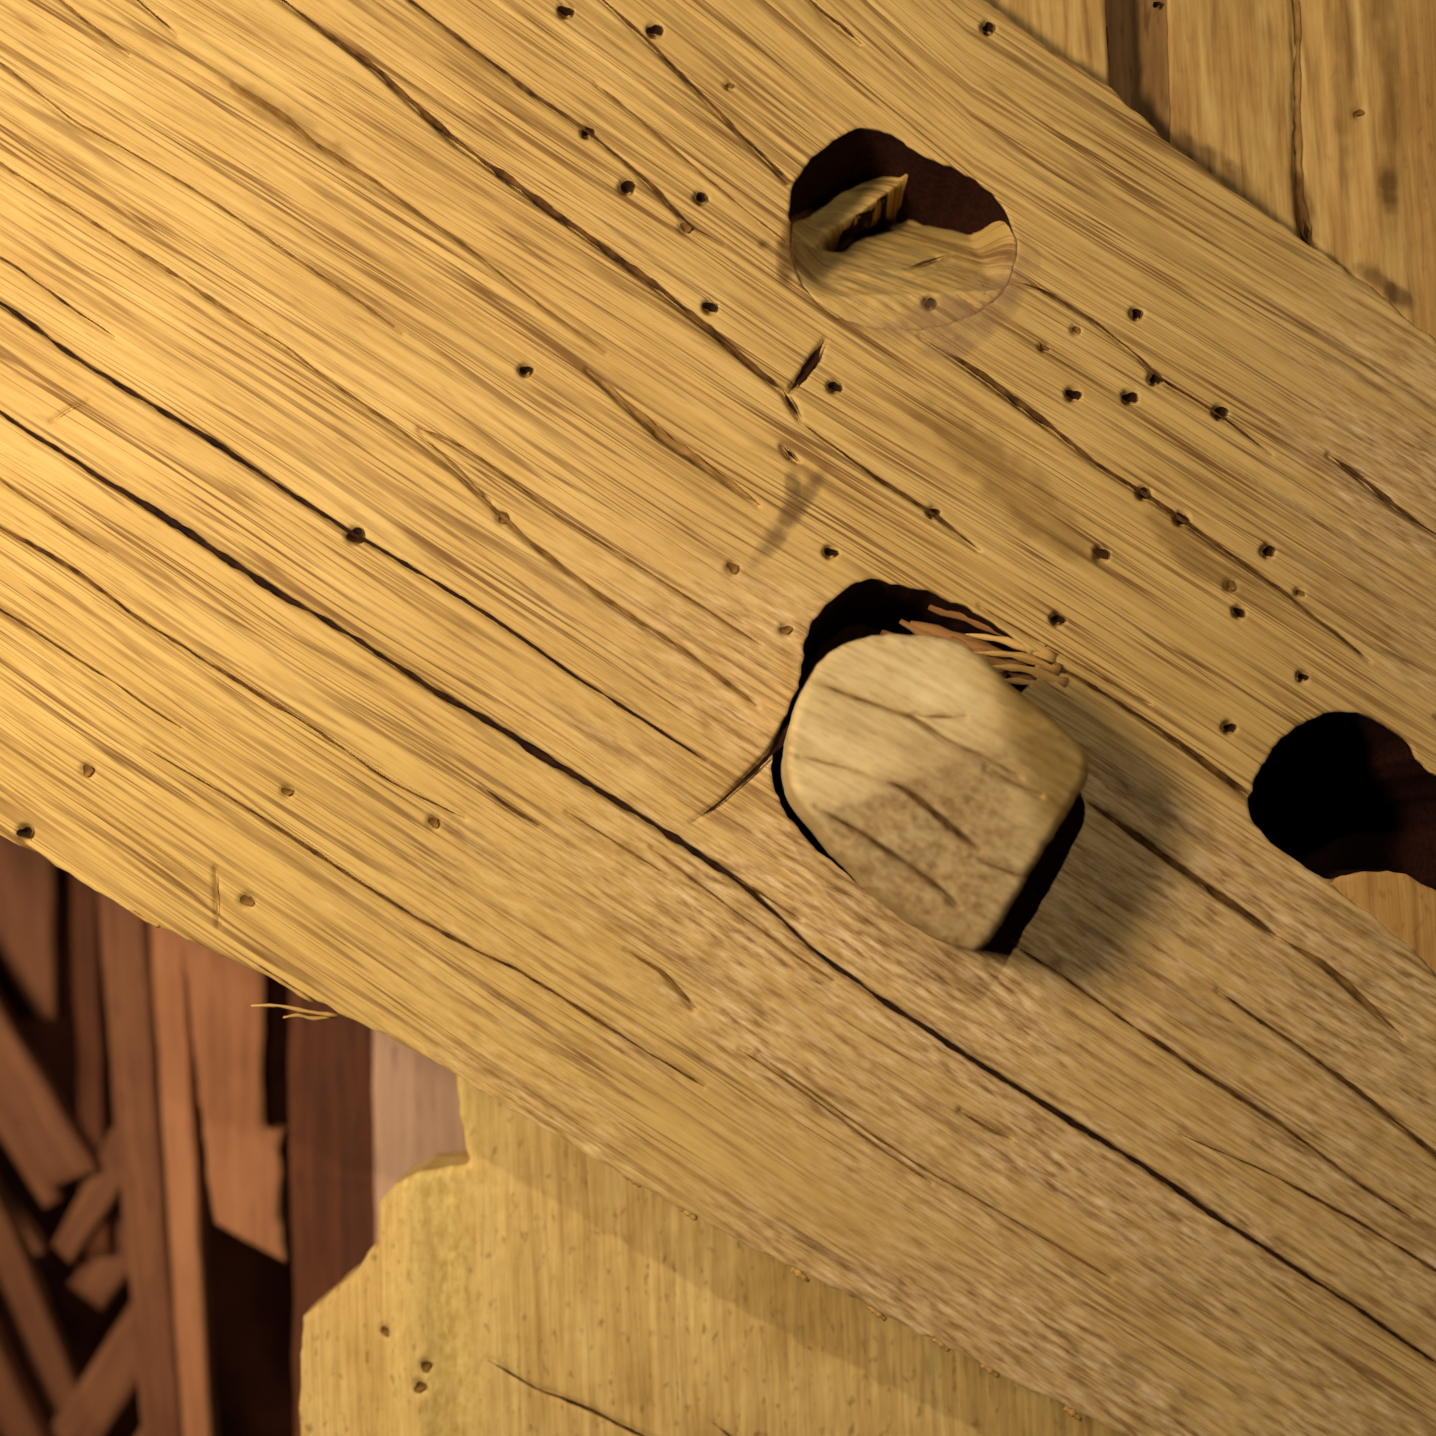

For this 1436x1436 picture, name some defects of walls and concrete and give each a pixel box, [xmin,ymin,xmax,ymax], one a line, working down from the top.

crack [0,162,760,705]
crack [235,0,979,550]
crack [0,257,1436,1363]
crack [488,1360,646,1436]